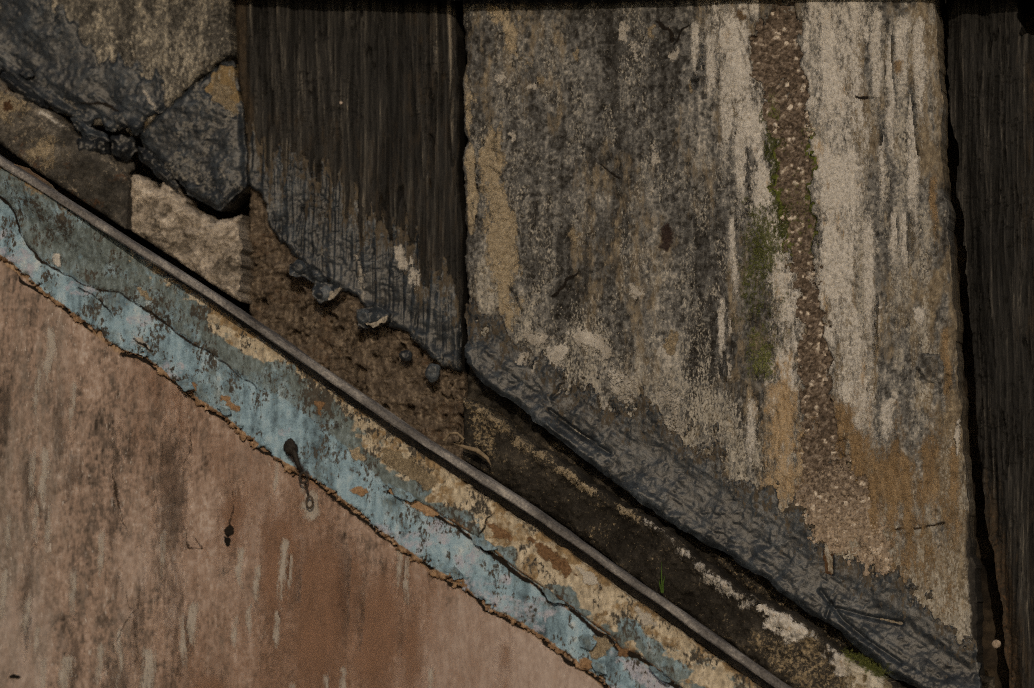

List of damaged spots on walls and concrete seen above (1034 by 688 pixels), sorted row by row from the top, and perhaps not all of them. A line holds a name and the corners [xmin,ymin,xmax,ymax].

crack [0,196,256,387]
flaking render [464,75,640,405]
crack [551,269,579,297]
leakage [658,224,673,252]
leakage [690,0,926,479]
flaking render [749,0,897,577]
crack [112,463,124,524]
crack [120,338,608,688]
flaking render [464,401,603,496]
crack [434,515,680,688]
peeling [528,537,598,585]
flaking render [672,538,846,676]